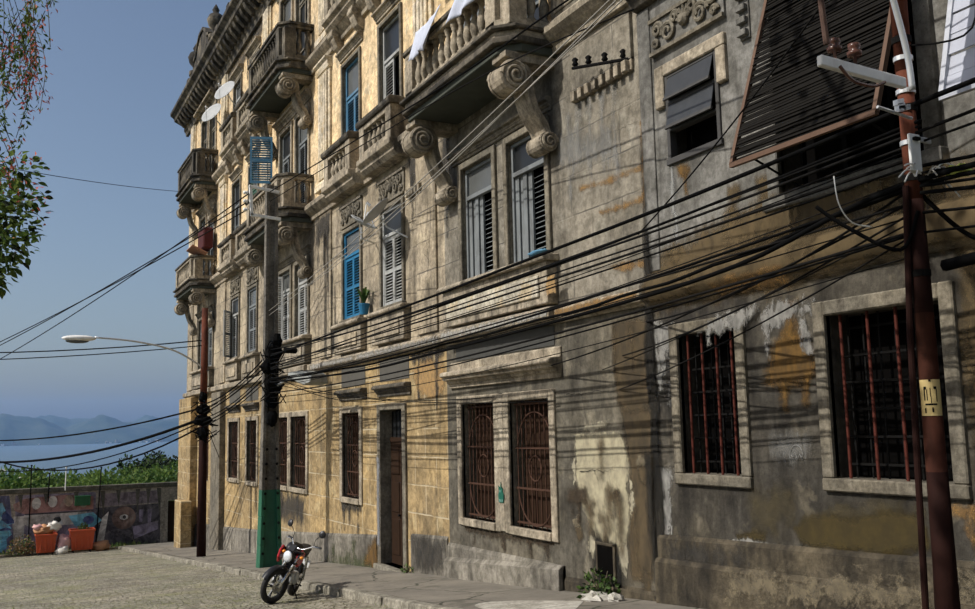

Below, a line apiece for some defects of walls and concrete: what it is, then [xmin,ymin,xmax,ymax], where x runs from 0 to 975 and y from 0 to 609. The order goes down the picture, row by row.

peeling [571,421,646,577]
peeling [653,321,672,393]
leakage [589,143,930,591]
leakage [922,159,975,428]